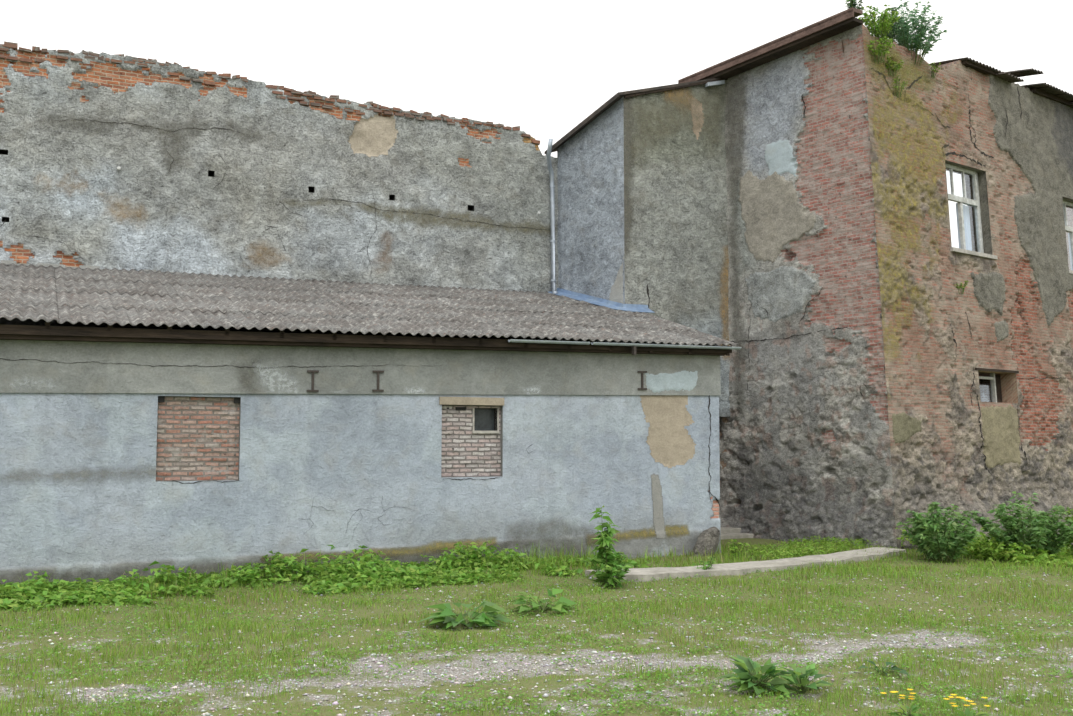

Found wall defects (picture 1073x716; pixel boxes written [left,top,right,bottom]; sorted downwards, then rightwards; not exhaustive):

flaking render [0,47,247,113]
flaking render [284,90,398,157]
flaking render [459,118,502,143]
crack [871,68,1022,158]
flaking render [779,34,922,444]
flaking render [970,75,1073,451]
peeling [640,395,696,468]
crack [950,312,992,476]